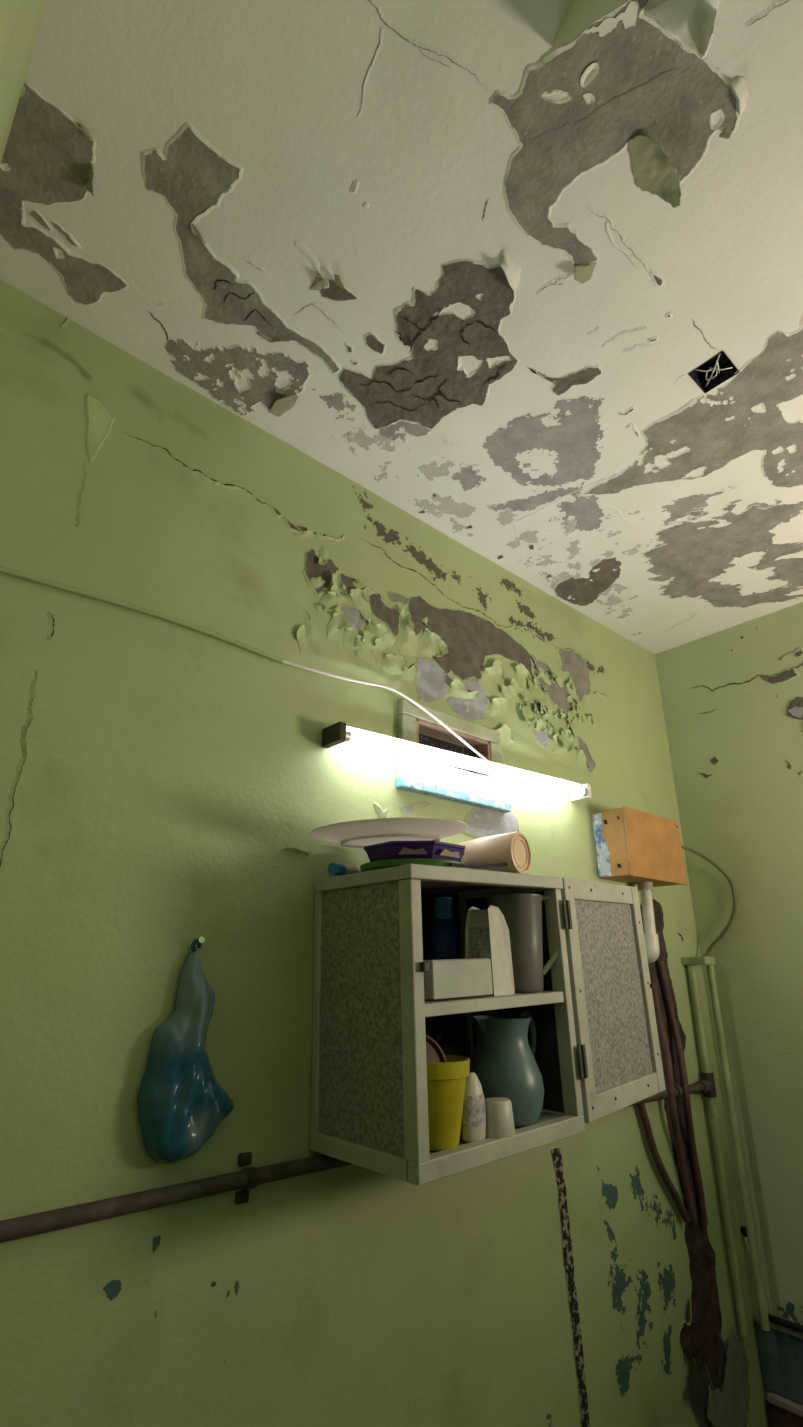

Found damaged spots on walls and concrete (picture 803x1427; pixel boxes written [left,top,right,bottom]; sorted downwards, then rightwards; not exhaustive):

peeling [0,81,129,306]
crack [356,0,493,119]
peeling [488,0,749,284]
flaking render [140,122,803,608]
crack [121,431,613,703]
crack [512,468,635,533]
crack [0,612,55,867]
peeling [699,756,719,779]
peeling [758,649,803,733]
peeling [597,898,722,1397]
peeling [103,1280,121,1301]